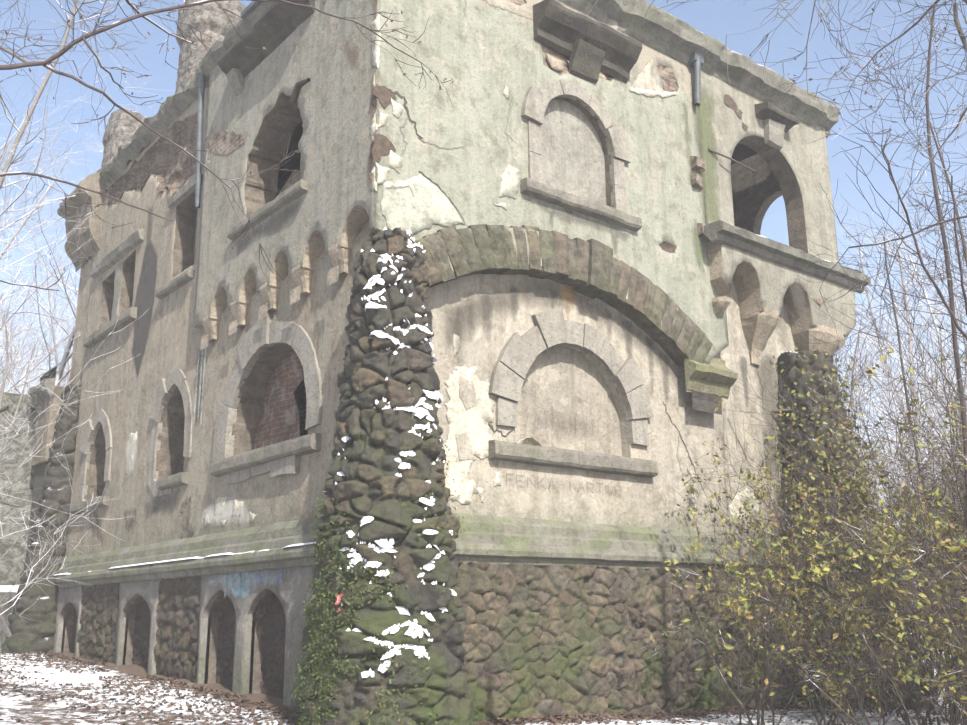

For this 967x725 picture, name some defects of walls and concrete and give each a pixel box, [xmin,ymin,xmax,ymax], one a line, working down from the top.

peeling [629,59,678,98]
spalling [107,106,245,206]
peeling [368,14,465,234]
crack [390,89,463,155]
peeling [494,164,521,211]
peeling [126,432,137,473]
peeling [444,334,501,504]
crack [663,402,706,494]
peeling [203,497,257,527]